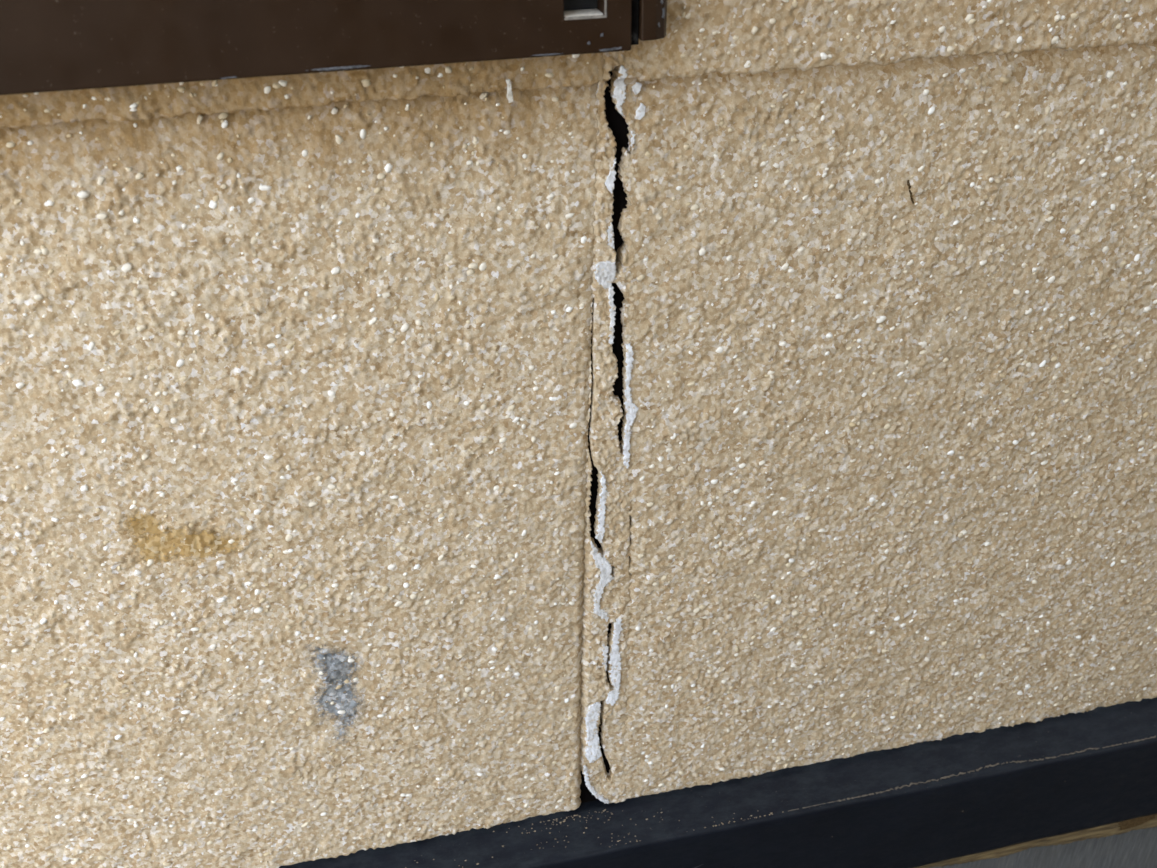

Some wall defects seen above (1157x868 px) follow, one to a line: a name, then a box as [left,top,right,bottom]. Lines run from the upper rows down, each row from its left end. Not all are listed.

crack [582,65,638,804]